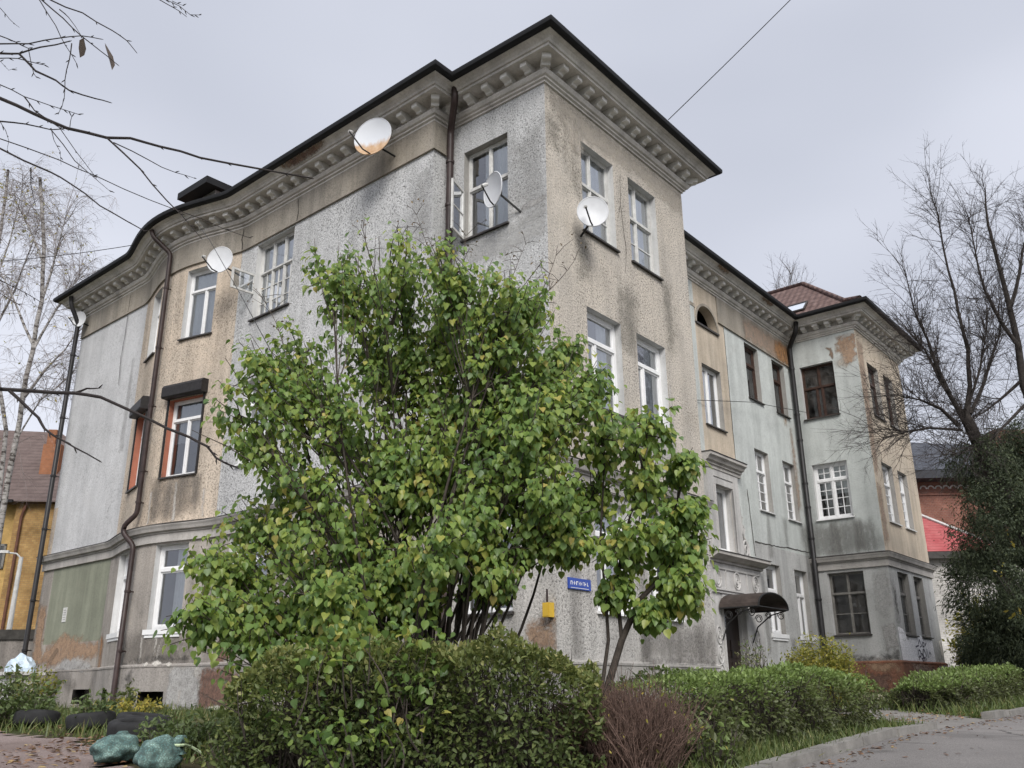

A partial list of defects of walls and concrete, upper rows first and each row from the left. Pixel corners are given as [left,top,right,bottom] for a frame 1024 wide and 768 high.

peeling [826,333,878,471]
peeling [878,489,888,540]
peeling [32,607,103,667]